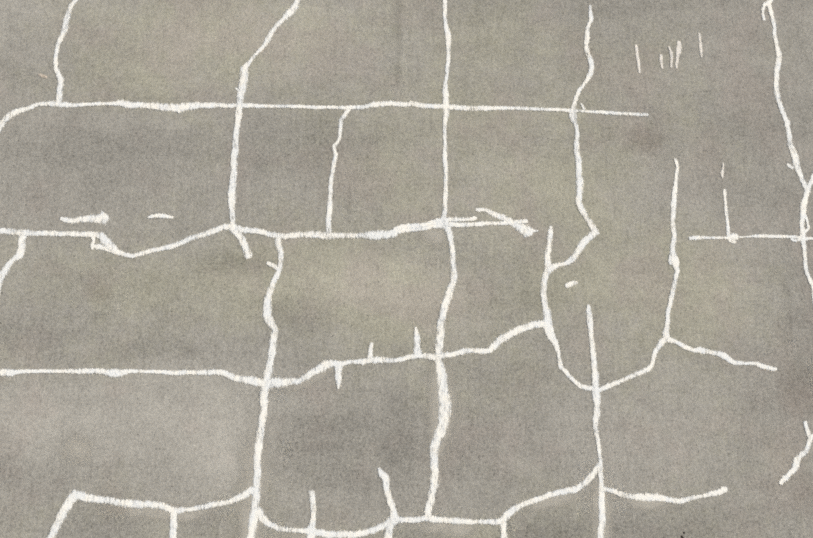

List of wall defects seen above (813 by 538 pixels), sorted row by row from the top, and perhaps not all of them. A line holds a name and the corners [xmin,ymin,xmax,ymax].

crack [0,0,600,538]
crack [530,5,777,538]
crack [689,0,813,302]
crack [779,421,813,485]